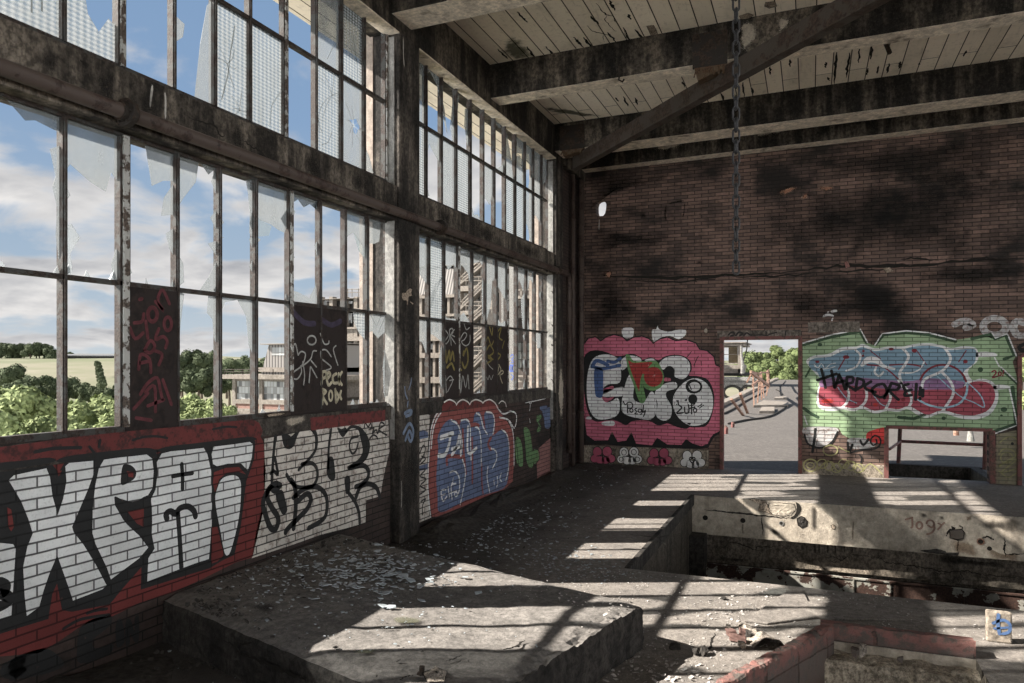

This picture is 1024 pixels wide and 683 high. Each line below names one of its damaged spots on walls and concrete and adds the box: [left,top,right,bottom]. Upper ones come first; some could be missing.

crack [603,256,1024,283]